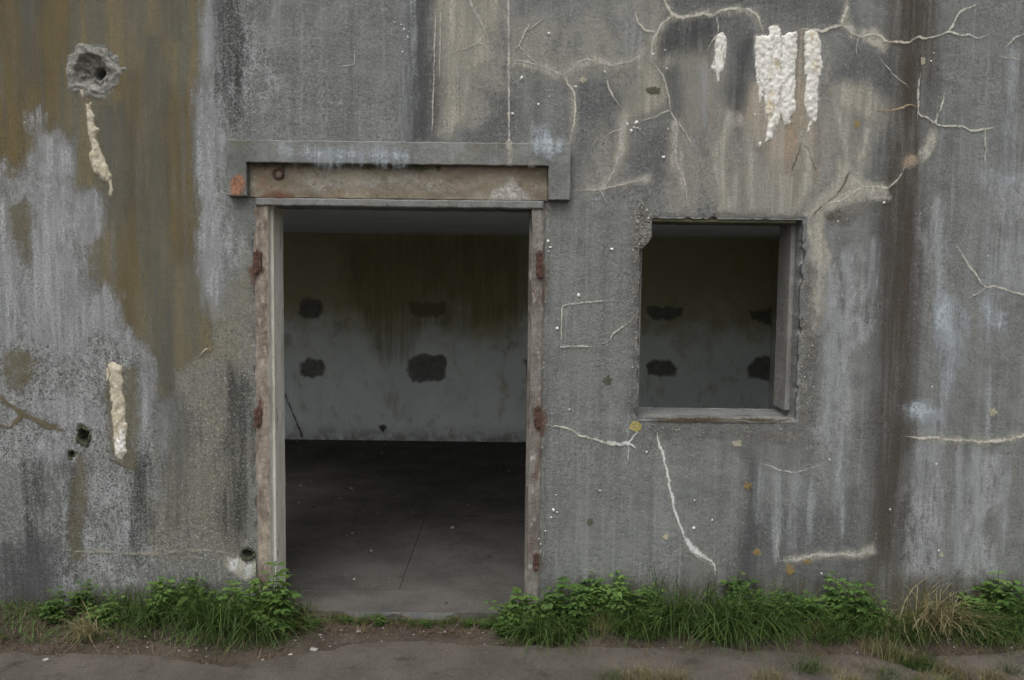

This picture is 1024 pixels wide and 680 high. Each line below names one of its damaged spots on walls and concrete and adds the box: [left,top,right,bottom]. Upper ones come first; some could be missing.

spalling [65,43,126,100]
crack [453,0,763,209]
crack [796,0,1024,161]
water stain [0,0,245,471]
rust [230,175,244,195]
water stain [510,0,936,340]
crack [812,165,907,216]
crack [0,395,66,431]
crack [544,416,790,570]
water stain [745,460,895,573]
crack [776,530,869,562]
crack [906,434,1024,443]